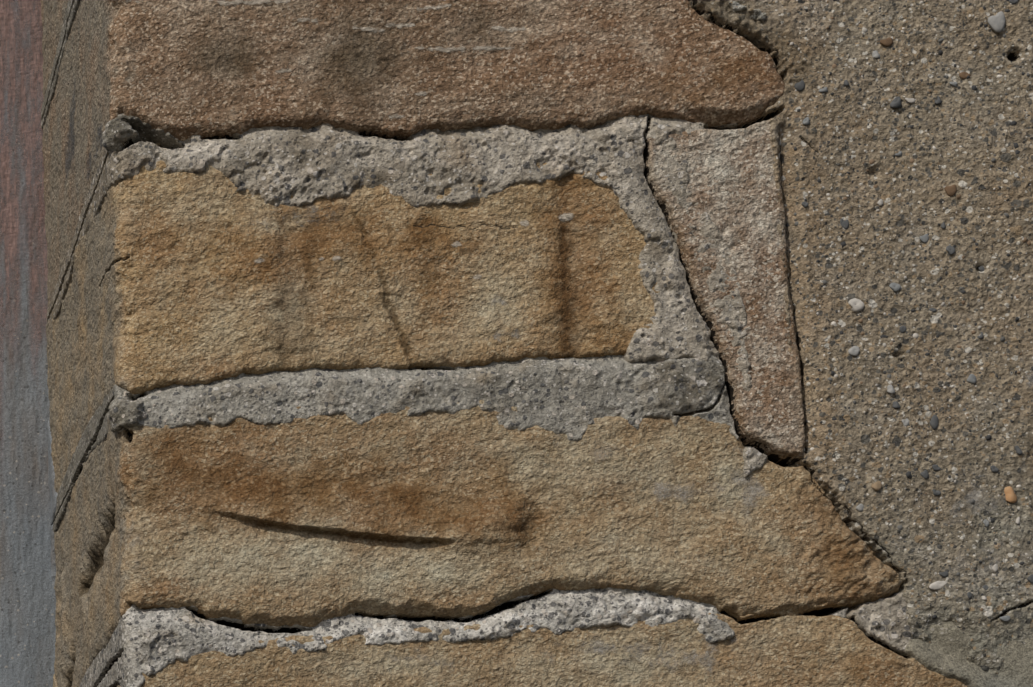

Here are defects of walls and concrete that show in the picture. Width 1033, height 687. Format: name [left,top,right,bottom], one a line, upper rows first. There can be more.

crack [643,118,907,581]